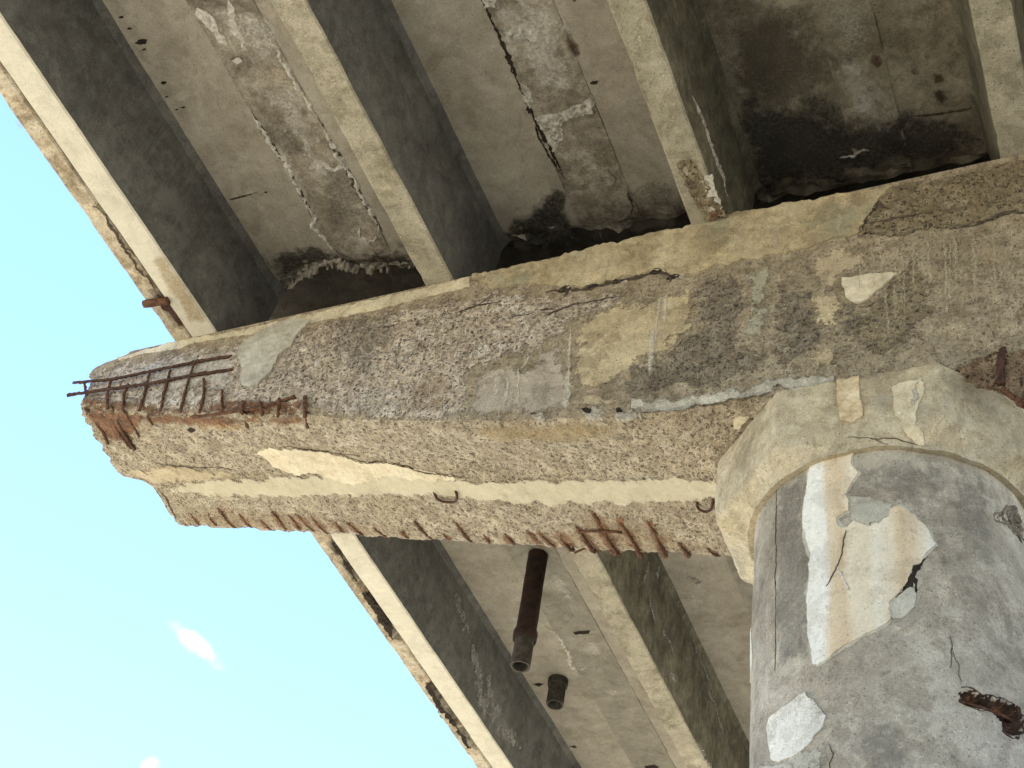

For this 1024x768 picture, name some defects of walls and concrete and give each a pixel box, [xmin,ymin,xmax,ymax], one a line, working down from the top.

crack [481,0,565,180]
water stain [739,59,979,194]
water stain [505,191,575,252]
spalling [85,288,621,424]
rust [84,398,302,442]
peeling [254,447,465,485]
rust [191,509,387,538]
rust [527,511,646,556]
crack [771,497,779,671]
peeling [802,453,936,665]
crack [896,557,927,598]
peeling [766,692,827,763]